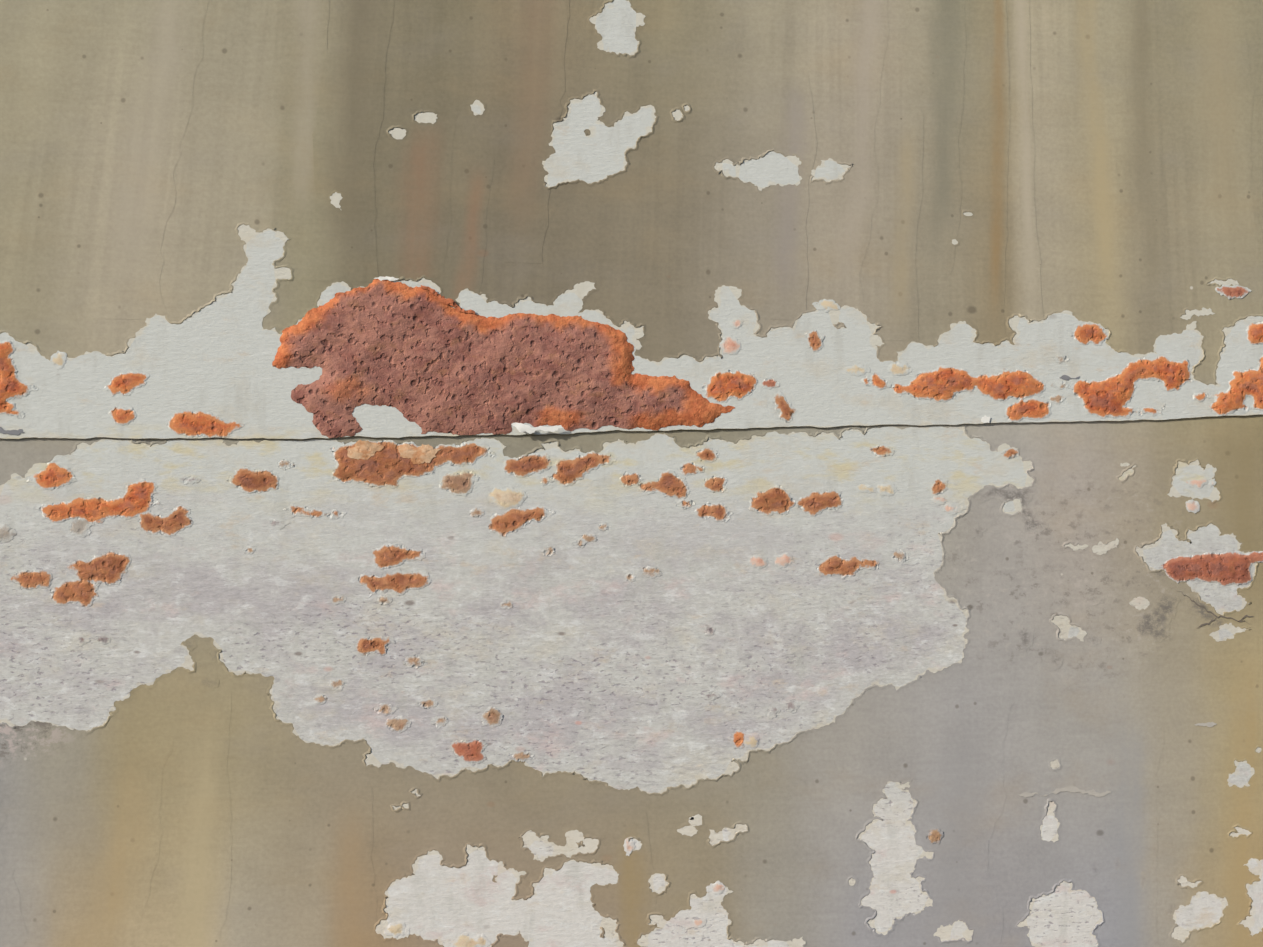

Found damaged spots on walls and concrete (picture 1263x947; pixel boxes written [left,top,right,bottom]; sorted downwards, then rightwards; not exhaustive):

peeling [587,0,649,59]
peeling [540,89,692,190]
corrosion [270,0,796,537]
corrosion [844,321,1263,423]
corrosion [26,461,193,537]
peeling [0,222,1263,813]
corrosion [748,484,843,517]
corrosion [7,551,132,607]
corrosion [1160,551,1263,586]
peeling [373,827,807,947]
peeling [846,778,935,939]
peeling [1168,858,1263,945]